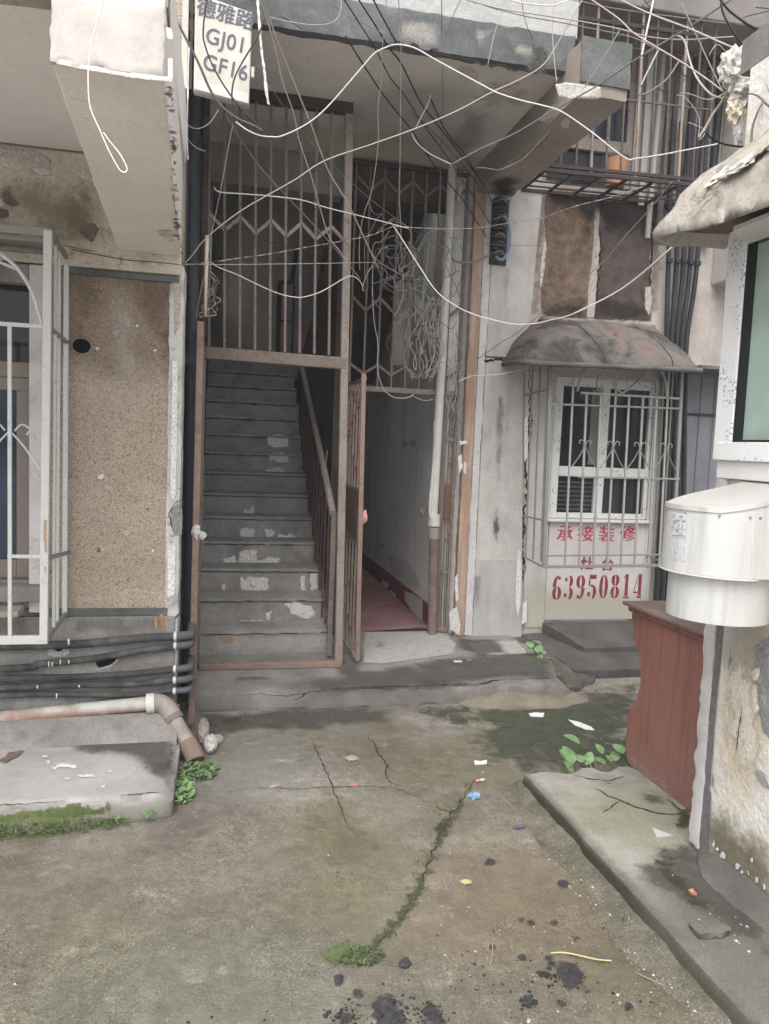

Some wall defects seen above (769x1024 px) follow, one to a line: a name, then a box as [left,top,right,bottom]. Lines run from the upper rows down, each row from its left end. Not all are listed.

spalling [0,191,20,218]
spalling [79,223,99,242]
peeling [266,434,289,472]
crack [522,370,533,580]
peeling [223,527,299,563]
peeling [240,576,269,591]
peeling [284,573,318,619]
crack [228,677,563,700]
spalling [750,638,769,737]
crack [572,774,682,814]
spalling [755,769,769,789]
crack [223,735,473,941]